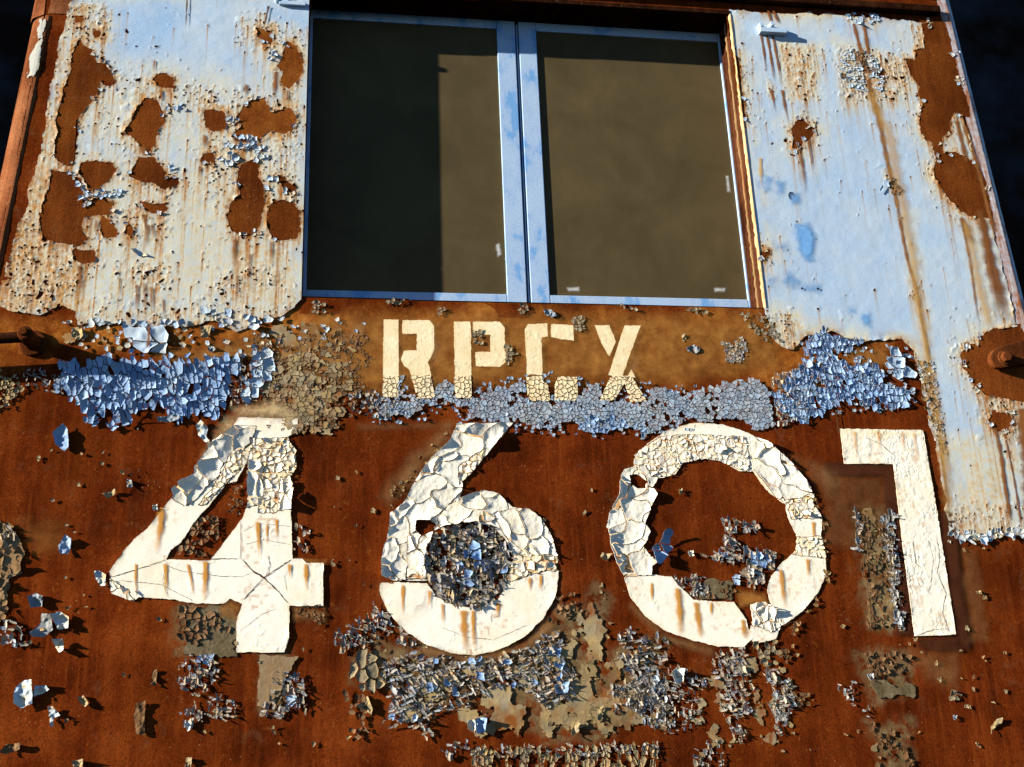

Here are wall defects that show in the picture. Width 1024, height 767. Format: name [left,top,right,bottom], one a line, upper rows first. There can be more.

rust [38,16,179,285]
rust [199,6,304,174]
rust [226,159,301,256]
rust [284,319,770,384]
rust [903,18,1024,523]
peeling [0,300,947,611]
peeling [0,521,71,653]
crack [113,523,292,628]
peeling [177,604,238,733]
peeling [257,646,307,745]
peeling [334,515,819,767]
rust [823,463,969,651]